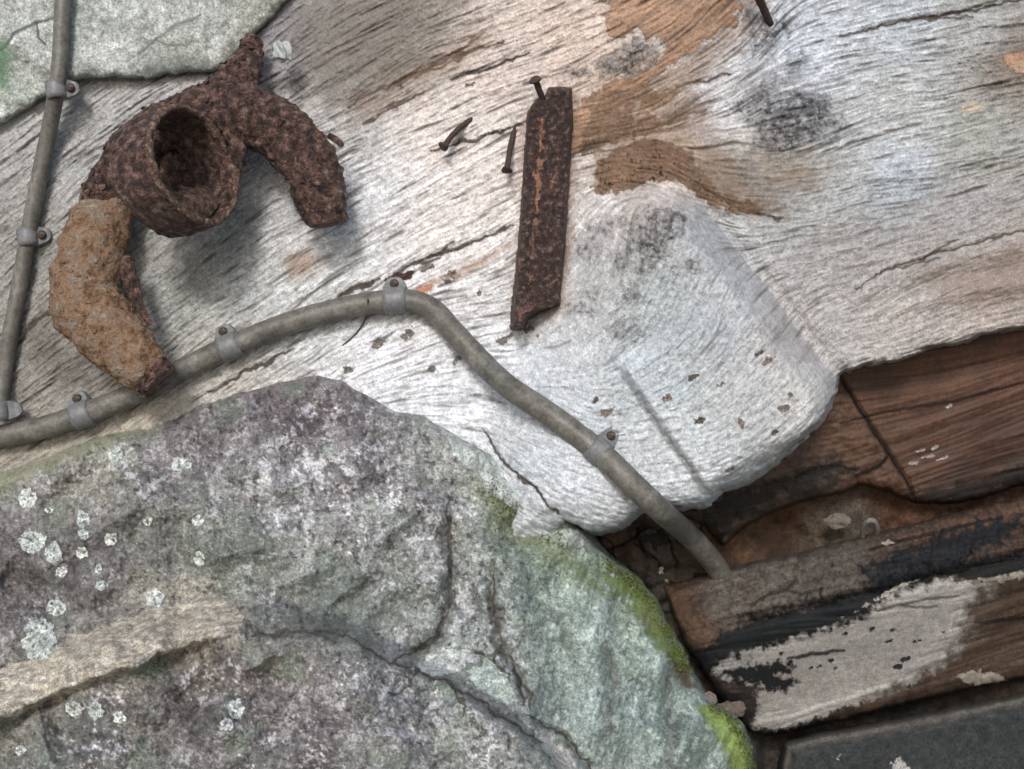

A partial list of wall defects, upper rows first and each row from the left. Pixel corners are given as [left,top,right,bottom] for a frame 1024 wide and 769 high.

corrosion [188,33,281,108]
corrosion [79,145,122,202]
peeling [711,570,1024,733]